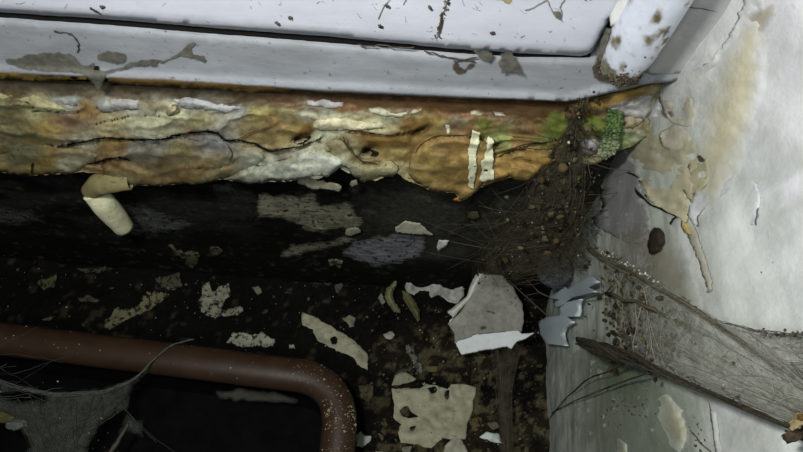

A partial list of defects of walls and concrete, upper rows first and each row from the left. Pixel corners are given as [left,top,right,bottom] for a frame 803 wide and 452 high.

peeling [678,0,764,78]
crack [47,124,320,164]
crack [342,129,451,169]
peeling [0,77,713,293]
peeling [359,384,374,402]
peeling [380,344,502,452]
peeling [356,431,371,448]